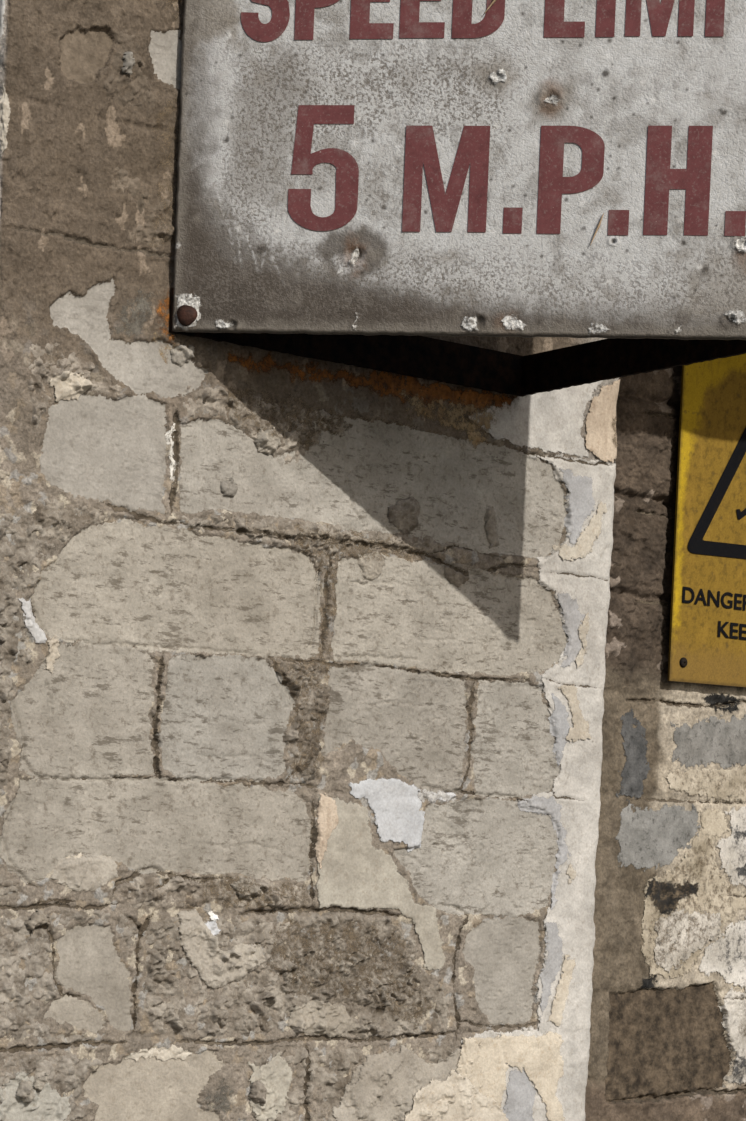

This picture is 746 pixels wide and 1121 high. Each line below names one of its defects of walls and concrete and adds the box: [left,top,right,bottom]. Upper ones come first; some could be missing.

spalling [111,167,174,251]
rust [152,292,175,363]
crack [103,410,610,801]
peeling [0,278,620,1121]
crack [626,698,746,709]
crack [624,797,742,805]
crack [0,869,223,1053]
spalling [604,709,746,1103]